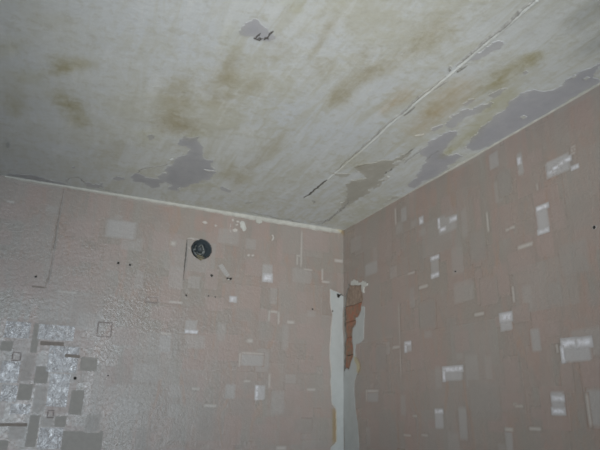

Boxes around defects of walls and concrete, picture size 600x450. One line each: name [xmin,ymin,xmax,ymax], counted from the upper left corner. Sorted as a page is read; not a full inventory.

peeling [239,18,275,41]
crack [303,0,535,203]
peeling [465,63,600,151]
peeling [113,136,216,191]
peeling [317,88,508,222]
crack [245,201,349,224]
flaking render [330,279,368,450]